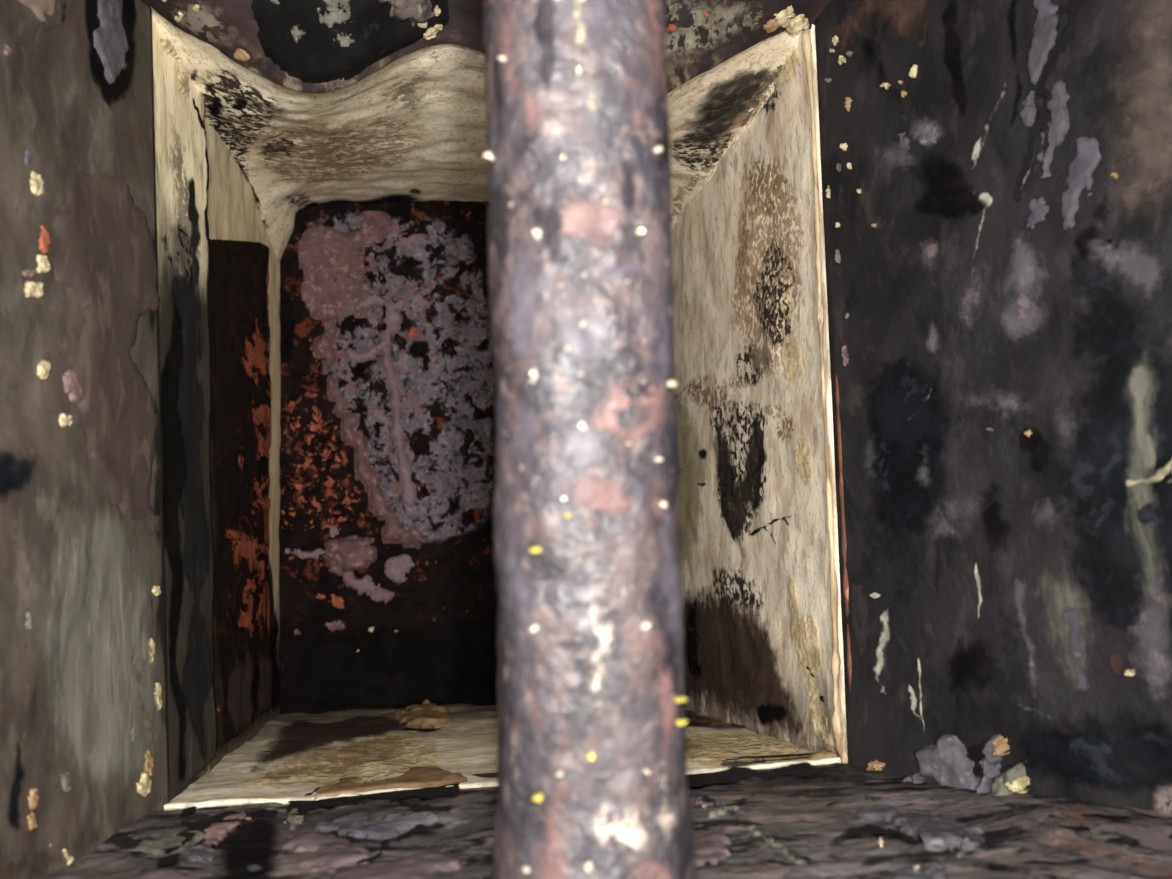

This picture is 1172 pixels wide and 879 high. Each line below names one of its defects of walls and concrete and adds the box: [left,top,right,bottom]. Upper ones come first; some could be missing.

peeling [85,0,137,105]
peeling [317,0,356,48]
rust [224,271,364,636]
rust [482,0,785,879]
leakage [752,418,767,510]
peeling [284,548,325,559]
peeling [343,554,415,604]
leakage [974,564,982,618]
leakage [1110,366,1172,698]
leakage [874,611,890,692]
leakage [909,658,924,724]
peeling [977,734,1028,796]